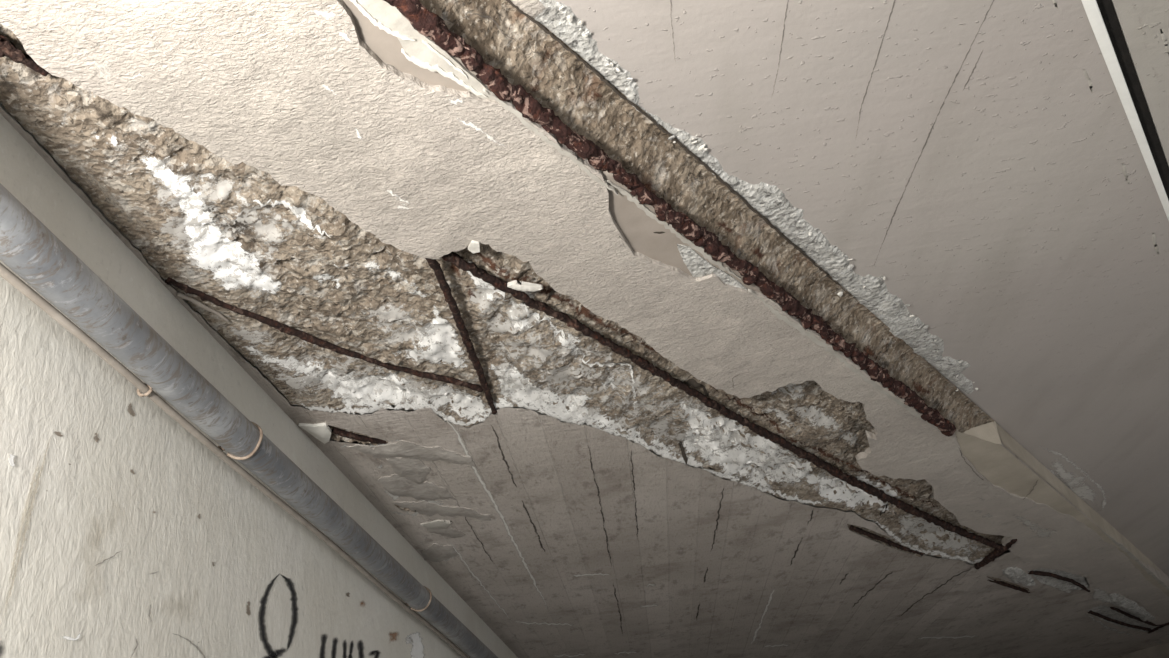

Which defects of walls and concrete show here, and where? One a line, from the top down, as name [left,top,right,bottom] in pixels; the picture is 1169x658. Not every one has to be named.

damp [80,99,117,146]
crack [856,0,895,136]
crack [879,50,981,252]
damp [140,155,331,302]
spalling [0,0,1004,564]
corrosion [475,252,663,357]
crack [492,427,545,551]
crack [588,447,623,634]
crack [679,442,688,464]
crack [696,489,724,620]
corrosion [711,386,938,508]
spalling [987,568,1088,591]